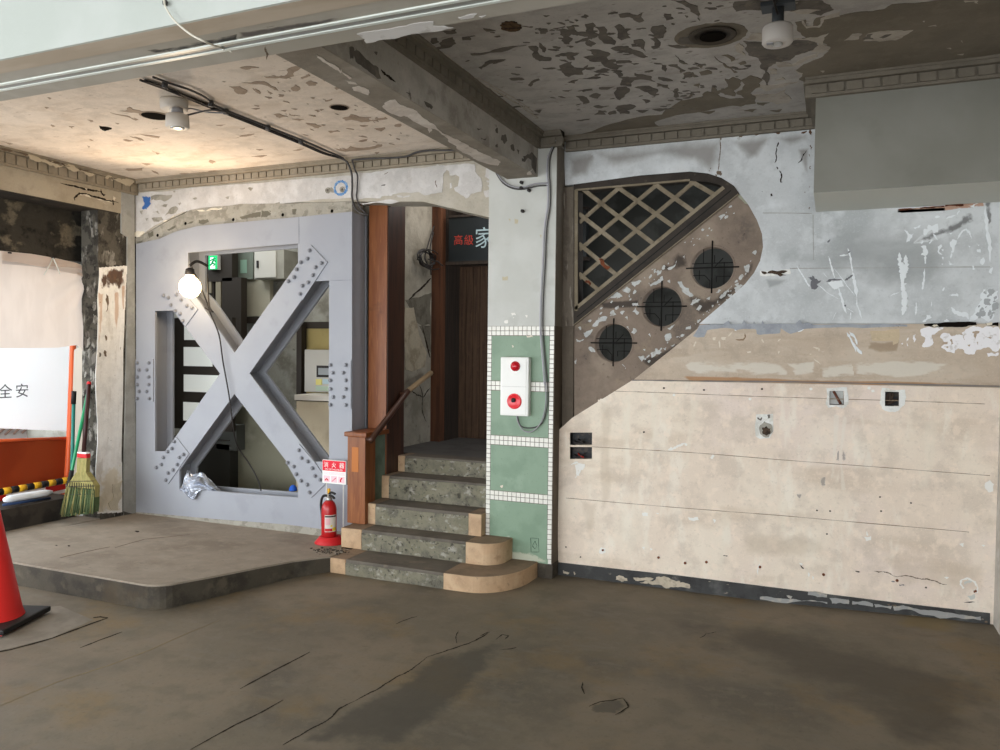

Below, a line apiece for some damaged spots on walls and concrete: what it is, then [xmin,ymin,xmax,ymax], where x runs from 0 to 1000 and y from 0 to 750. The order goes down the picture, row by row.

peeling [349,0,1000,134]
crack [61,183,118,205]
peeling [0,55,537,237]
crack [404,278,431,422]
peeling [576,227,1000,363]
peeling [905,211,960,265]
peeling [616,575,690,588]
peeling [760,592,987,623]
water stain [283,635,514,750]
crack [283,632,516,745]